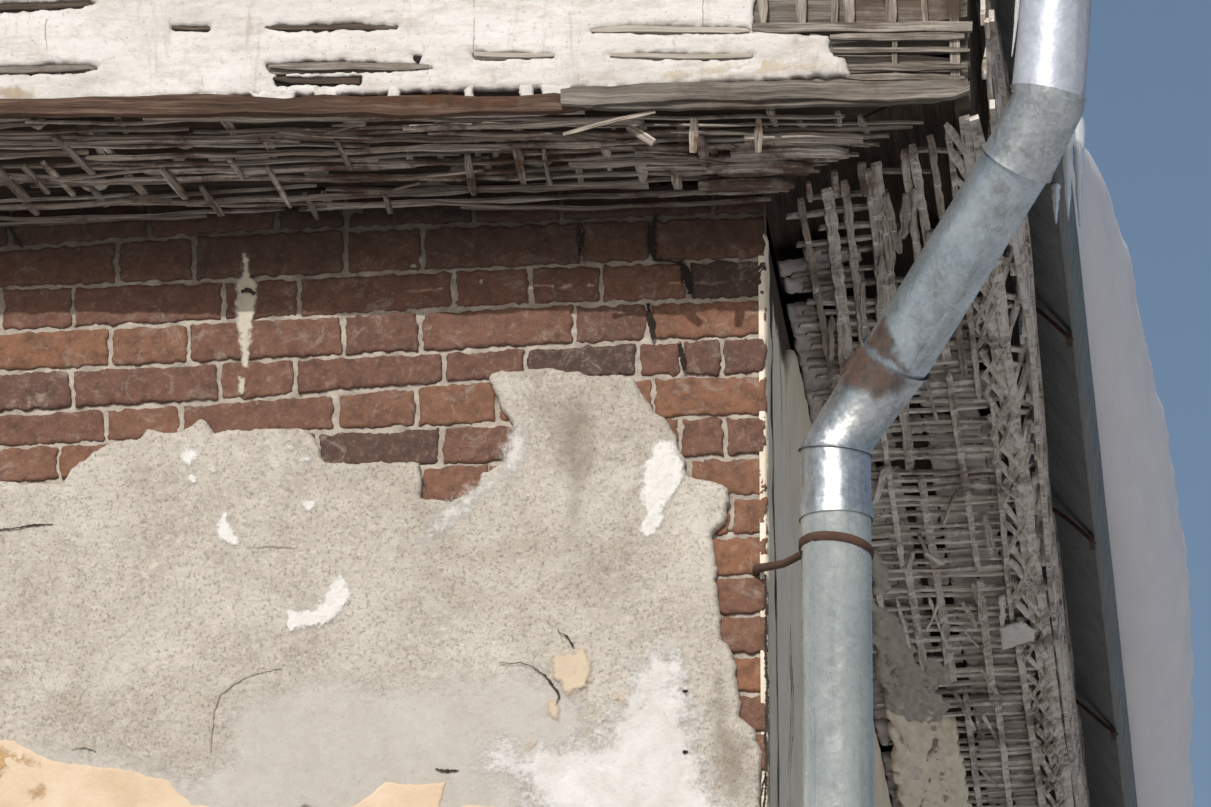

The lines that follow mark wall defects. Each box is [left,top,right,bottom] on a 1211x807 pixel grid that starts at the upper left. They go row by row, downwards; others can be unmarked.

spalling [591,0,973,81]
crack [0,523,53,531]
spalling [0,181,791,807]
peeling [999,621,1036,650]
crack [499,662,560,704]
peeling [872,548,972,807]